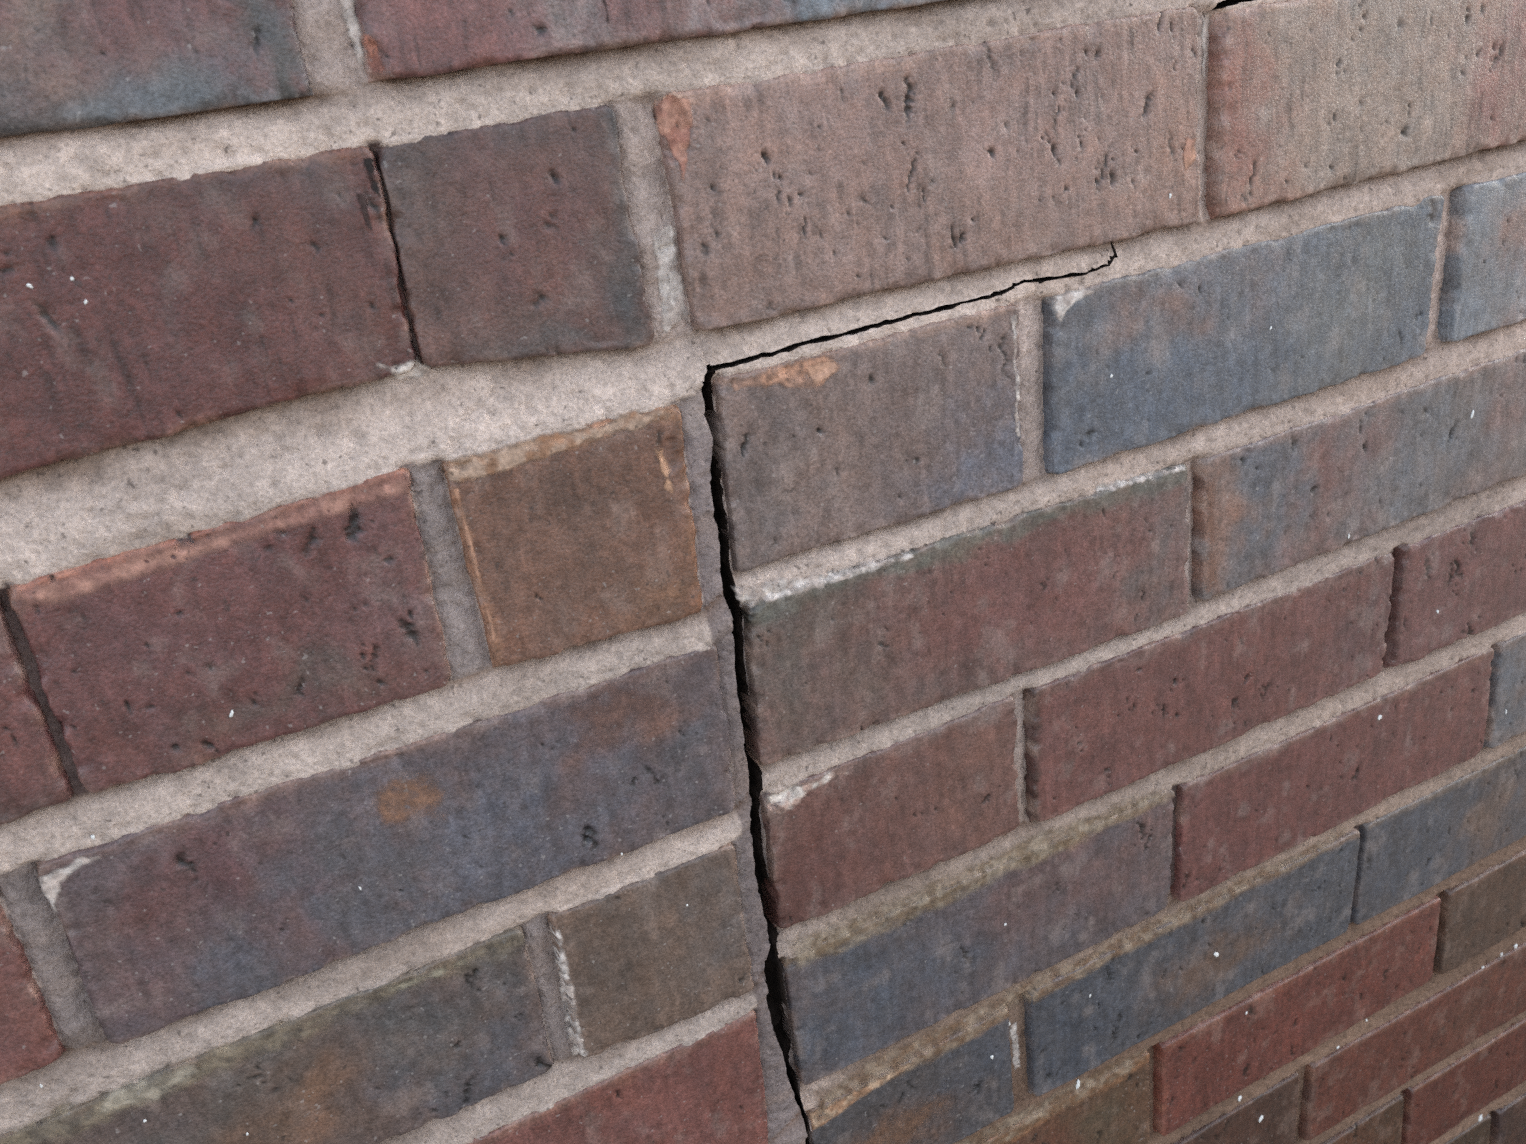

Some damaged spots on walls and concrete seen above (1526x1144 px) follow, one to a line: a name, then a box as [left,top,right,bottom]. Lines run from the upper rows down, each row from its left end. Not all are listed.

crack [1212,0,1253,10]
crack [701,242,1115,411]
crack [710,456,811,1144]